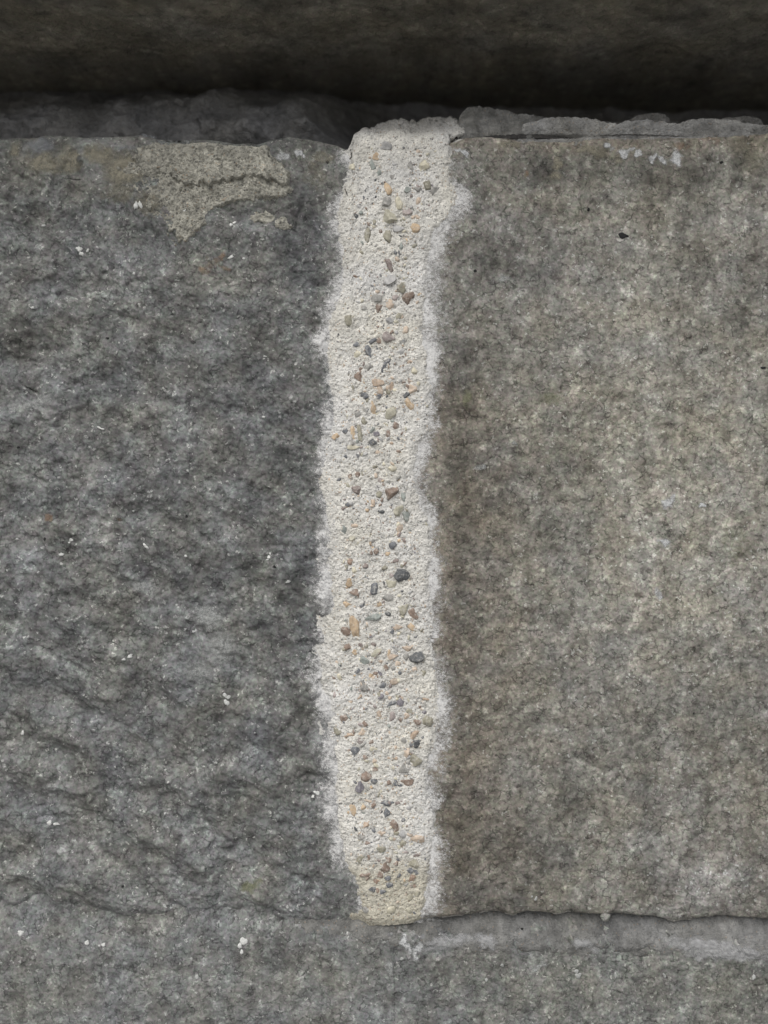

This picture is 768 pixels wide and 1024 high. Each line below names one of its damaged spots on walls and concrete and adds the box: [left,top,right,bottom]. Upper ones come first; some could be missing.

peeling [116,140,293,246]
water stain [304,628,356,879]
water stain [310,149,351,615]
water stain [413,152,472,923]